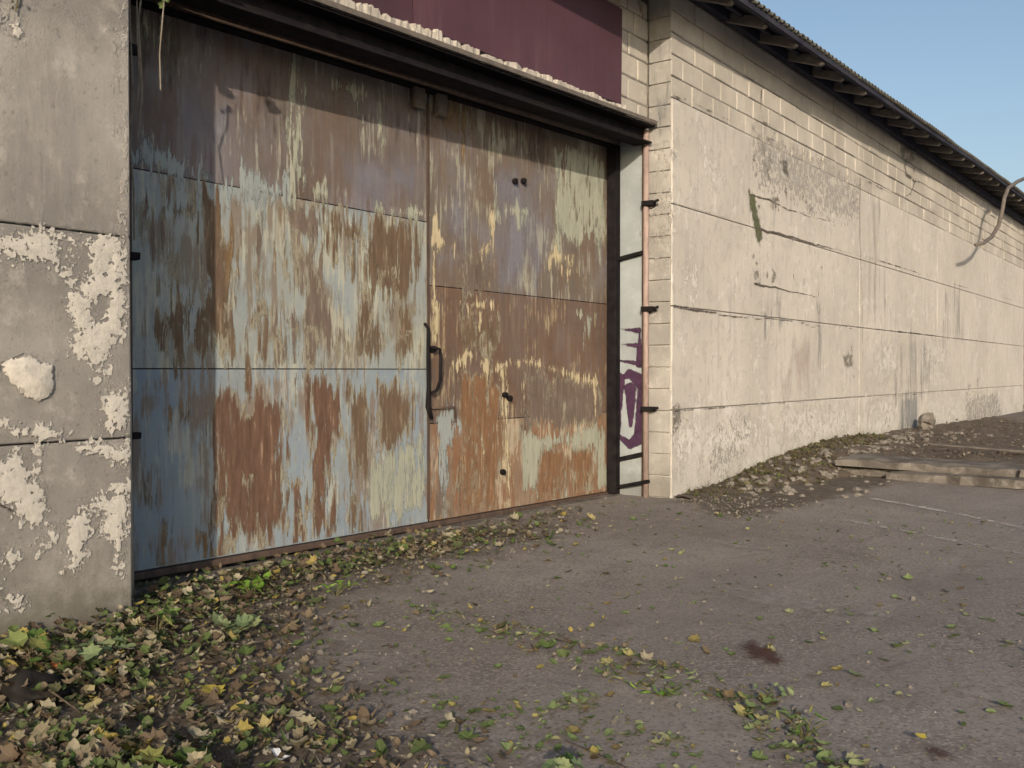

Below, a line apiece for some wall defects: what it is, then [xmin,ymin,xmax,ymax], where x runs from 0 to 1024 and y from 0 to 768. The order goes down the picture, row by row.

peeling [0,209,131,614]
rust [136,161,421,558]
rust [431,308,503,519]
rust [521,367,605,503]